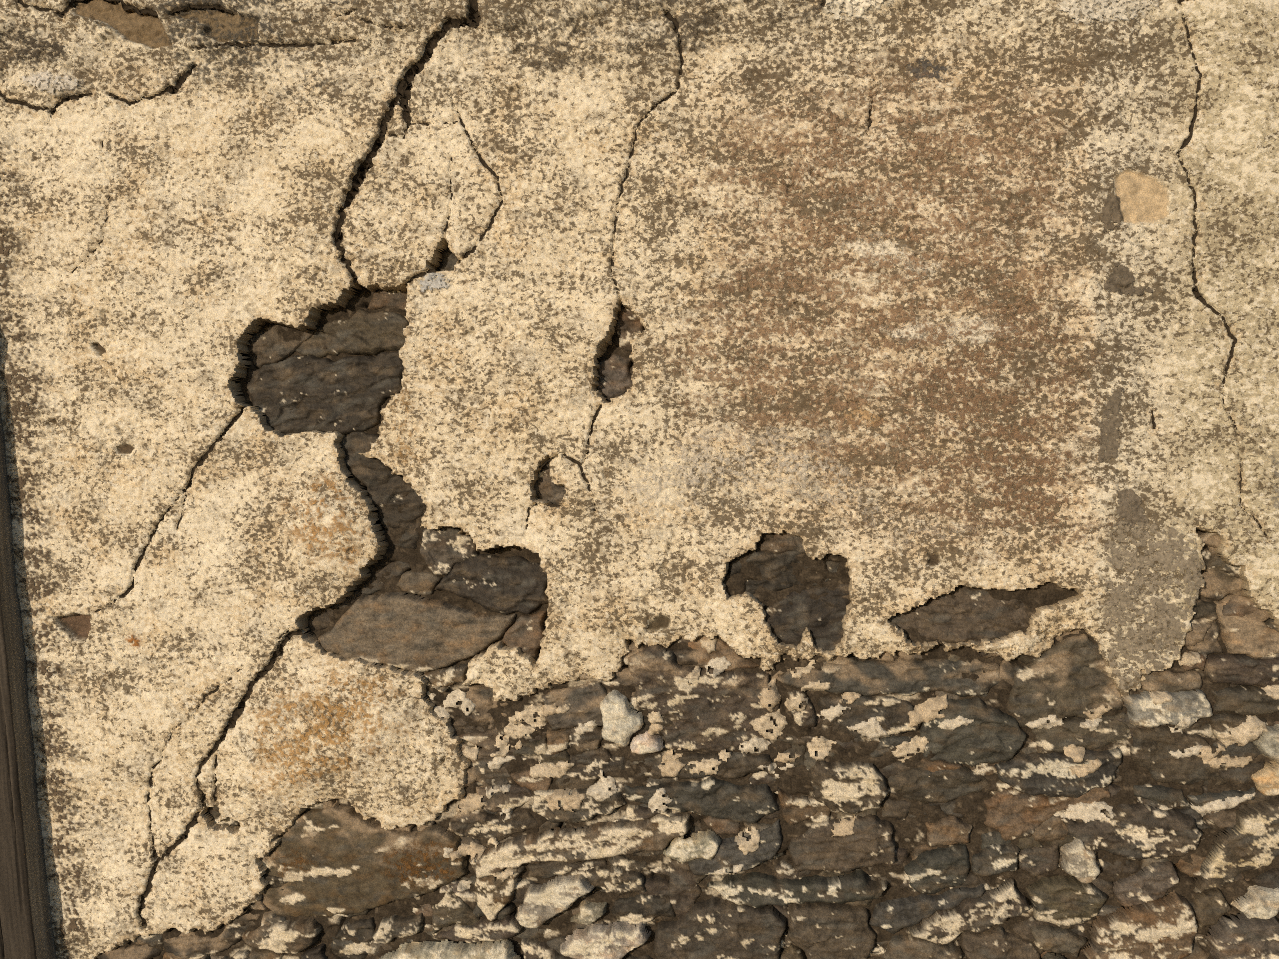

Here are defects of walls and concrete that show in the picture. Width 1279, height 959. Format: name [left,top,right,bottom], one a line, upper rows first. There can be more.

crack [611,12,683,300]
crack [1177,0,1267,536]
crack [94,406,245,613]
crack [525,503,562,529]
crack [539,405,602,511]
spalling [94,278,1083,959]
crack [138,629,302,926]
spalling [1025,703,1113,731]
spalling [1063,744,1103,778]
spalling [1053,801,1114,823]
spalling [1190,792,1256,817]
spalling [1168,715,1279,769]